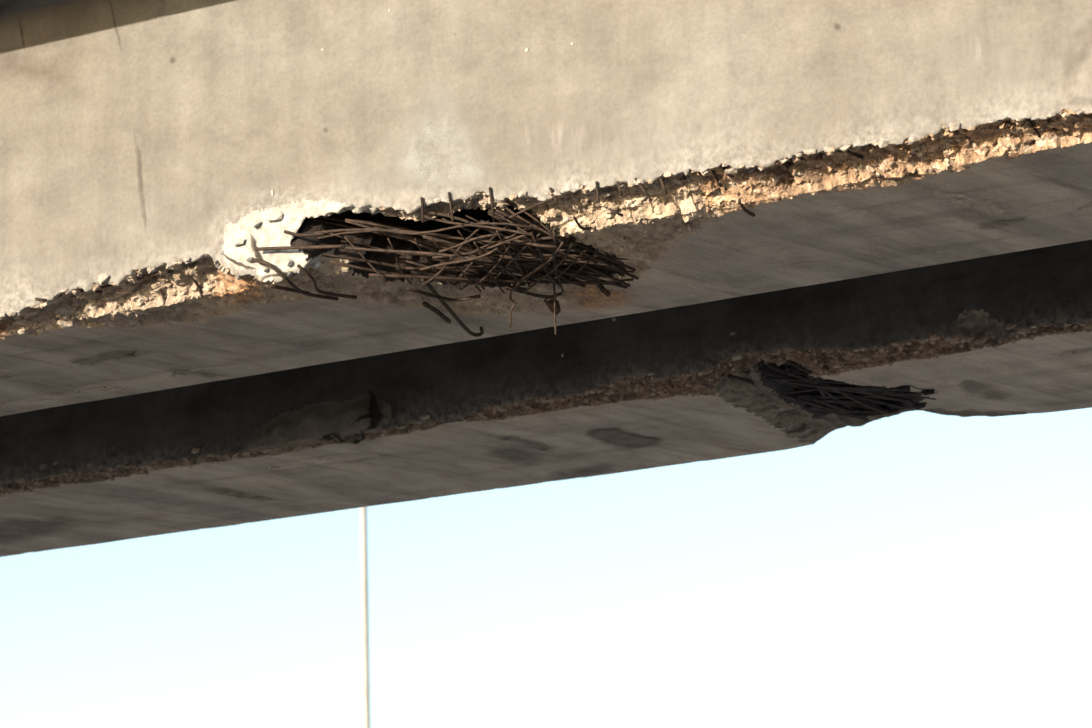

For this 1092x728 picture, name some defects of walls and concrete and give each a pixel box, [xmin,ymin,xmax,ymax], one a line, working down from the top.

spalling [0,109,1092,340]
spalling [0,309,1092,497]